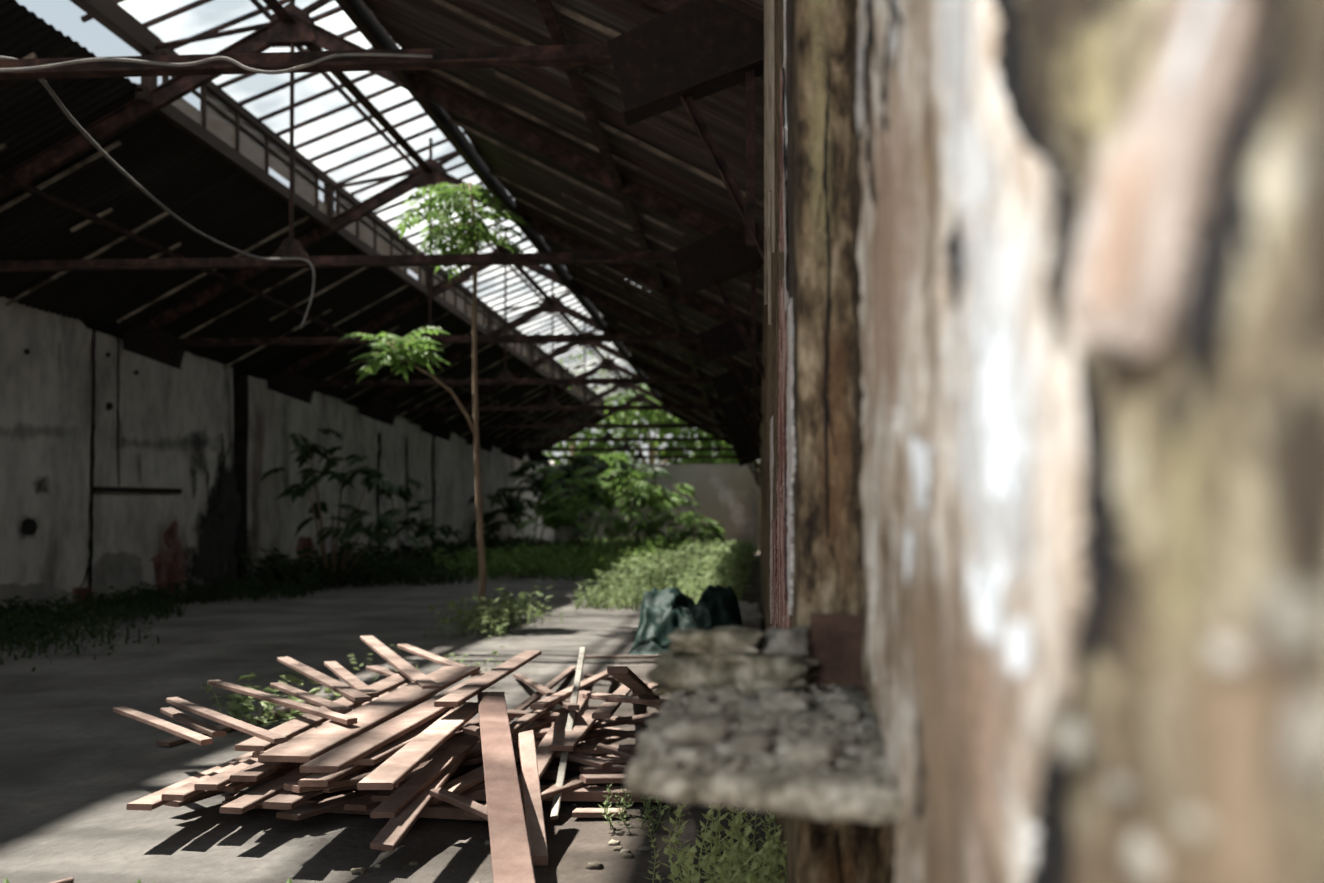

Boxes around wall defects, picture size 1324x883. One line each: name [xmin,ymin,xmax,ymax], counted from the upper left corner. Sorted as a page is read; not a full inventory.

crack [864,0,903,205]
flaking render [0,518,188,613]
damp [184,432,252,595]